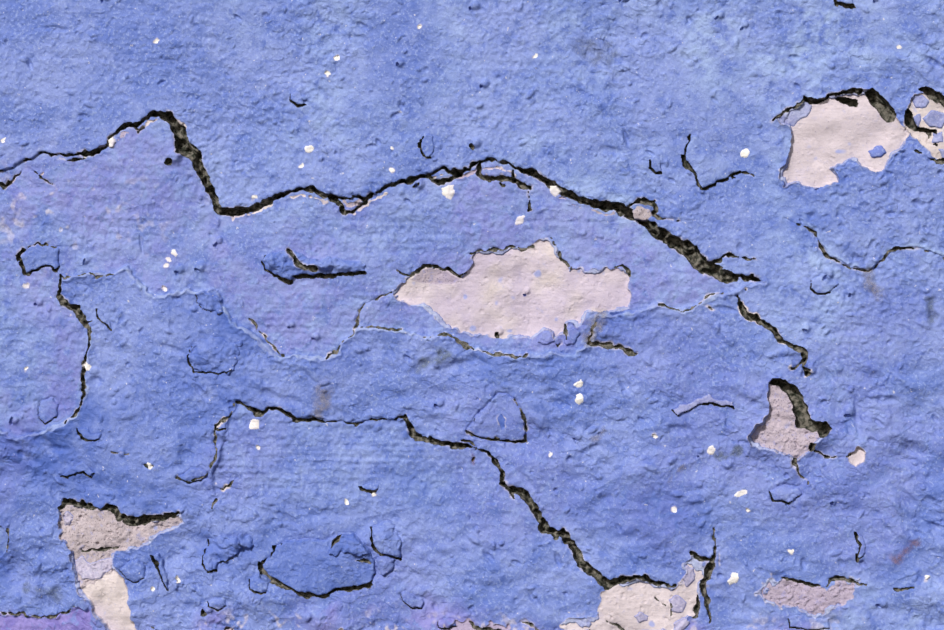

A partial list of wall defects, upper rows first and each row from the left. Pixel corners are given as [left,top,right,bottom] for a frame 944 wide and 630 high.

peeling [0,117,767,442]
crack [0,110,811,372]
peeling [772,86,944,270]
crack [796,223,944,272]
crack [56,272,114,424]
peeling [60,462,95,479]
spalling [57,498,184,630]
crack [175,401,717,624]
crack [469,621,539,630]
spalling [559,555,705,630]
flaking render [708,575,864,630]
spalling [747,378,832,461]